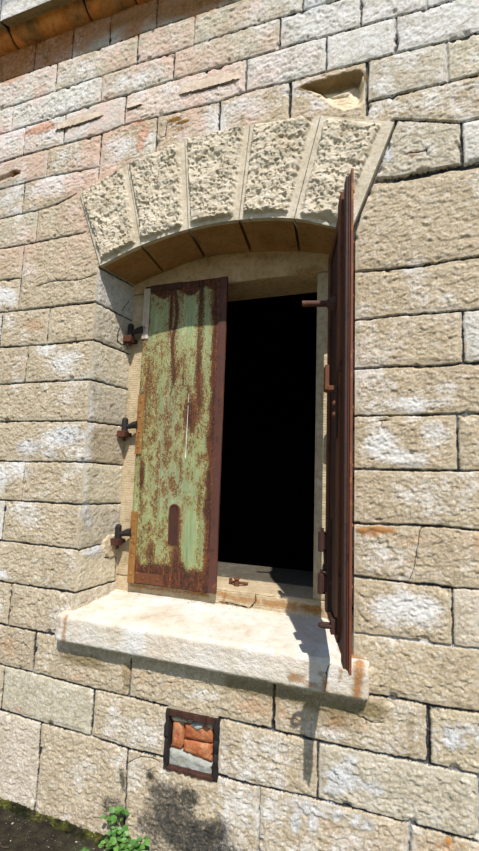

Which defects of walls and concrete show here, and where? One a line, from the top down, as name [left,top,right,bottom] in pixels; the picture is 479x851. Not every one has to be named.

peeling [179,72,241,96]
spalling [295,69,367,111]
crack [410,525,443,578]
rust [352,654,365,698]
water stain [137,771,237,851]